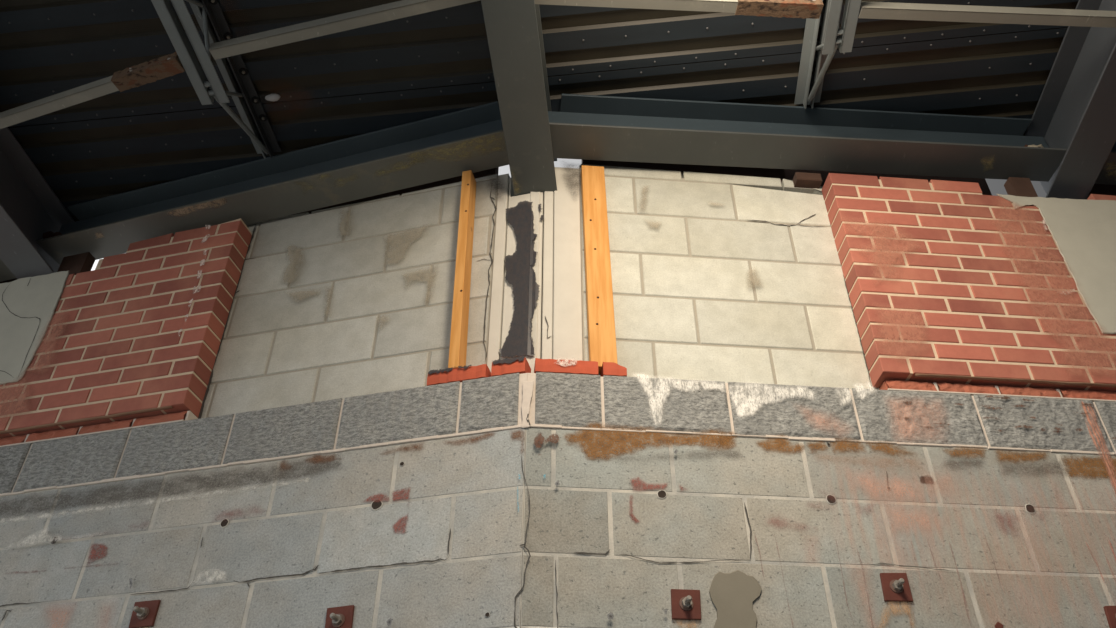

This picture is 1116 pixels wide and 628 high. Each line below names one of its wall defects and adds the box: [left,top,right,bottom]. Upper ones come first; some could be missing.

leakage [637,374,813,424]
leakage [839,383,874,405]
rust [565,423,732,460]
rust [947,448,1045,462]
rust [1064,456,1116,479]
crack [514,455,752,628]